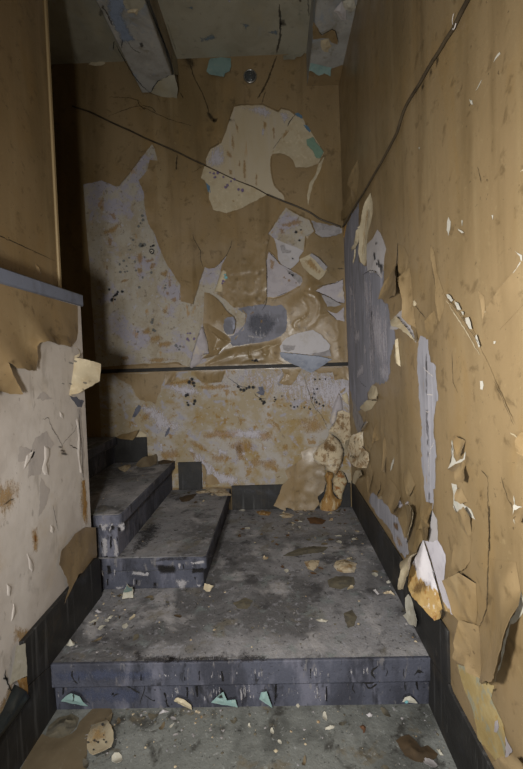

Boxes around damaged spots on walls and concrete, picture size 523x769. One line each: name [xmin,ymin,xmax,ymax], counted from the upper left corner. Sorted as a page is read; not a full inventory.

peeling [146,0,179,98]
peeling [0,284,78,394]
peeling [18,431,58,533]
peeling [59,407,149,602]
damp [171,378,198,406]
damp [190,449,246,485]
damp [221,368,349,411]
peeling [83,100,523,769]
flaking render [9,643,27,685]
peeling [21,693,112,769]